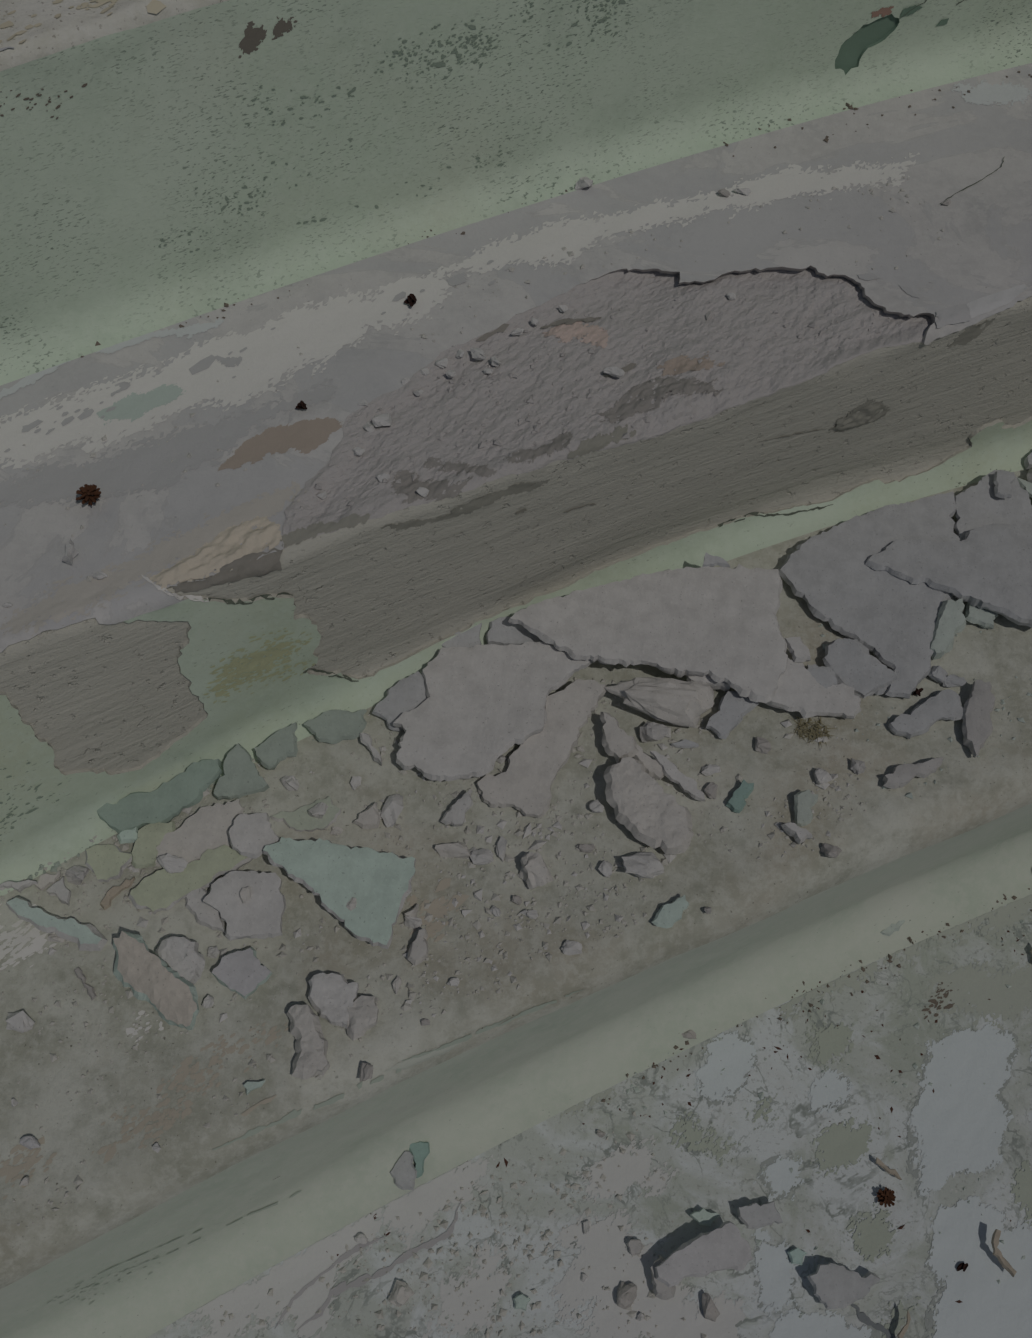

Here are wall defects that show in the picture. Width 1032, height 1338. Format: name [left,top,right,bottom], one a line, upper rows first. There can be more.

peeling [835,5,922,75]
peeling [142,265,1032,827]
peeling [0,618,208,775]
peeling [97,709,416,1030]
peeling [652,895,689,929]
peeling [781,789,818,845]